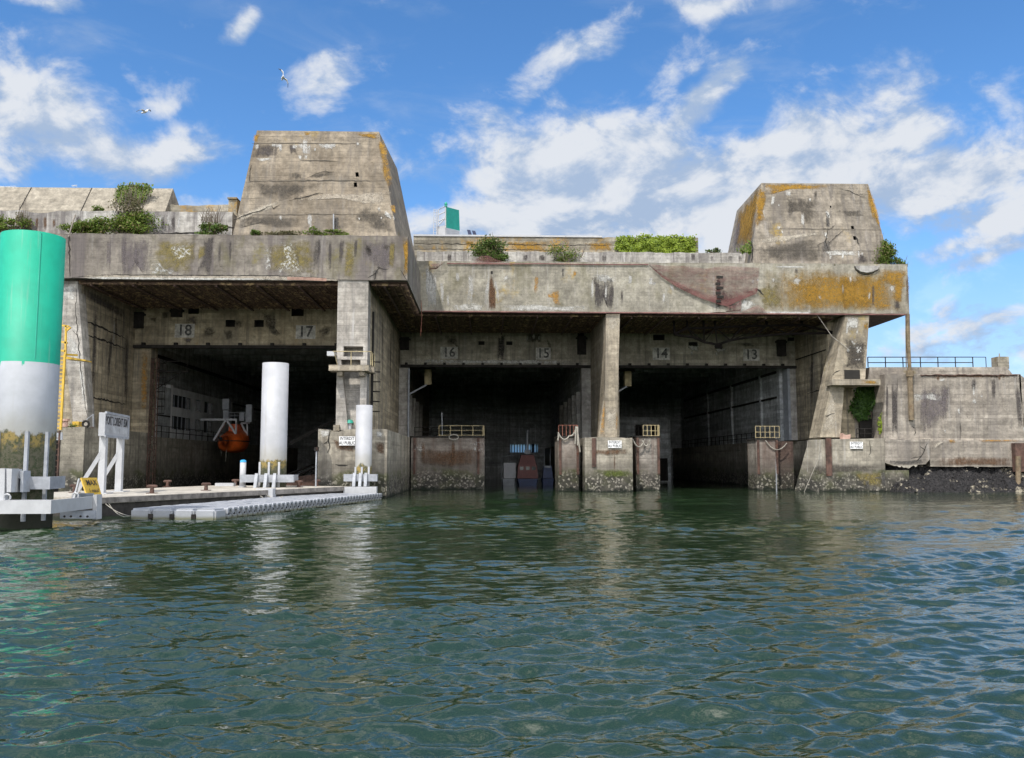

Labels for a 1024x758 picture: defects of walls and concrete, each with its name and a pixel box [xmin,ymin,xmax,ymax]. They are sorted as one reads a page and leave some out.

leakage [256,142,335,156]
leakage [260,174,305,196]
crack [227,143,385,228]
crack [161,229,198,237]
leakage [243,217,289,227]
leakage [358,209,391,230]
leakage [198,239,231,271]
leakage [314,242,408,267]
crack [162,273,335,281]
rust [715,276,724,306]
crack [68,240,135,413]
rust [421,443,471,465]